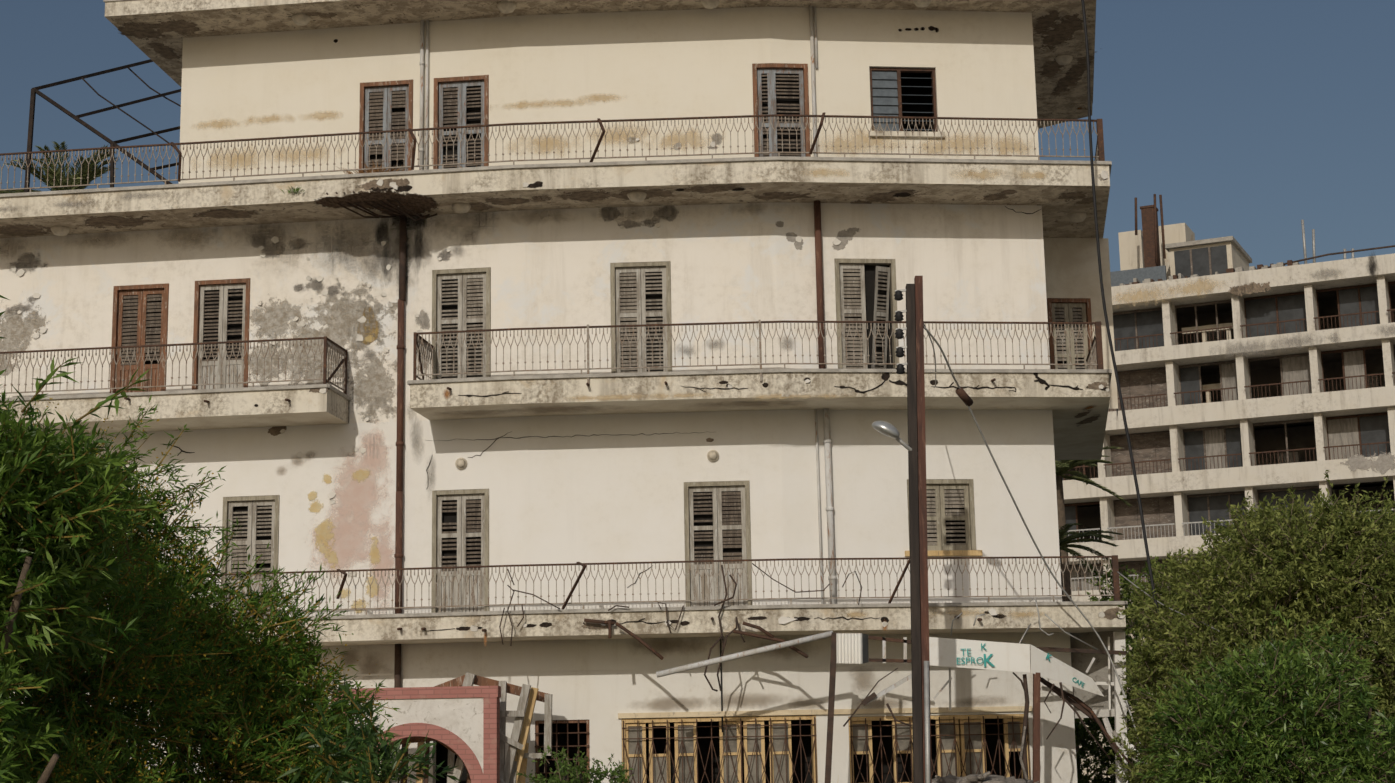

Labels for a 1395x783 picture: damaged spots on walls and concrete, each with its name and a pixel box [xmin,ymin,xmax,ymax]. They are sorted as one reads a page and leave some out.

spalling [0,224,52,237]
spalling [79,215,155,228]
peeling [0,293,48,376]
peeling [415,310,430,369]
crack [458,390,522,398]
crack [683,385,748,393]
crack [834,373,1083,394]
peeling [192,209,398,613]
crack [426,432,704,488]